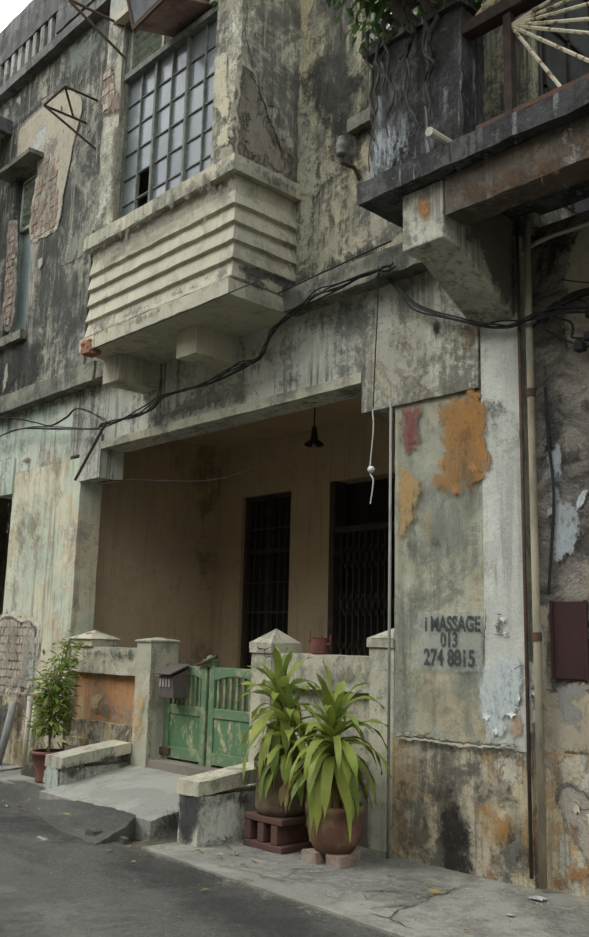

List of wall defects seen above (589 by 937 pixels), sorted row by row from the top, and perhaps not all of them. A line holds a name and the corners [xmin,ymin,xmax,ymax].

peeling [12,82,82,243]
crack [242,0,289,178]
flaking render [213,0,332,272]
flaking render [2,220,18,332]
leakage [8,497,50,569]
peeling [396,388,493,545]
peeling [543,441,588,562]
flaking render [0,608,41,698]
flaking render [556,681,589,729]
leakage [397,774,474,874]
flaking render [555,782,589,863]
crack [376,880,464,929]